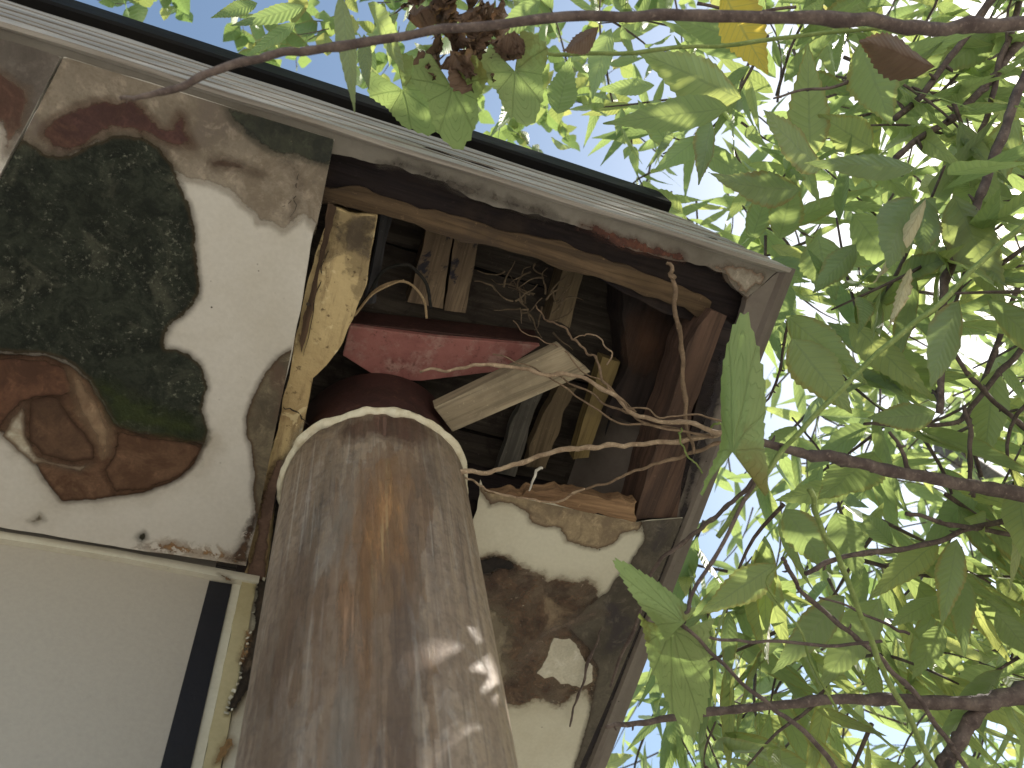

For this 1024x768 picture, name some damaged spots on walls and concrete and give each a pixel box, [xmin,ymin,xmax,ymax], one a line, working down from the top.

water stain [0,58,334,502]
rust [581,224,684,261]